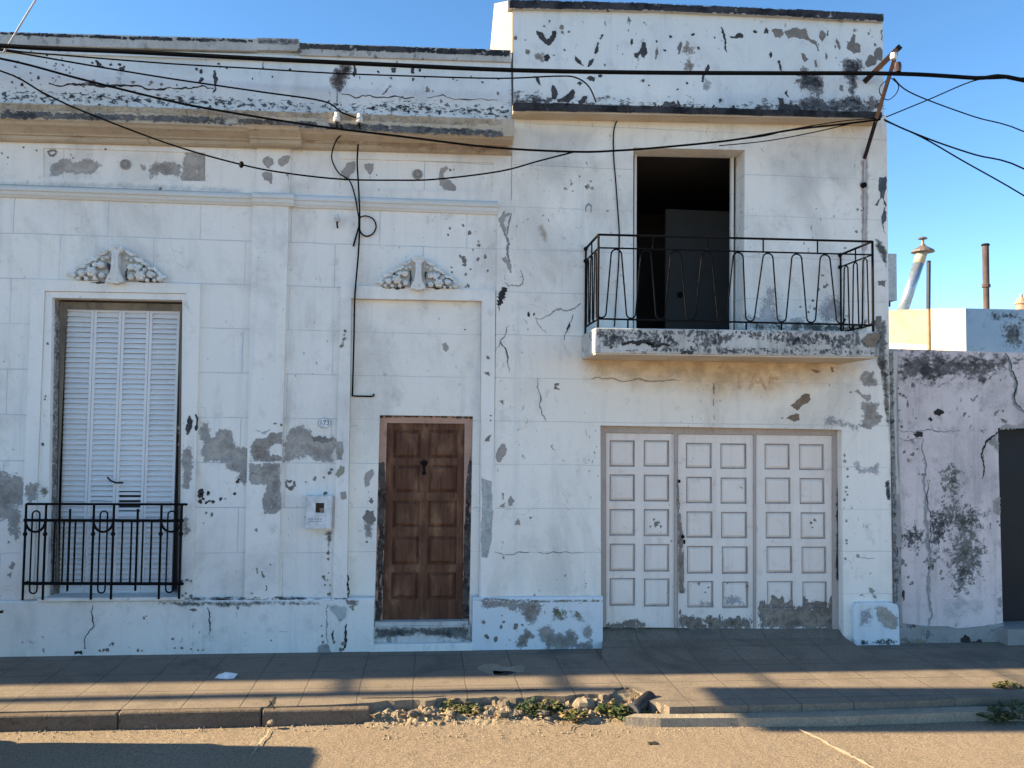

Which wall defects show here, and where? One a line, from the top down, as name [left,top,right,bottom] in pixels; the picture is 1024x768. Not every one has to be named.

peeling [730,27,883,111]
peeling [140,153,205,190]
crack [496,211,524,371]
crack [536,303,581,340]
crack [593,375,678,383]
peeling [177,414,345,524]
crack [981,431,999,478]
peeling [0,471,47,543]
spalling [461,458,593,650]
crack [496,549,578,557]
crack [899,429,961,626]
peeling [678,583,832,630]